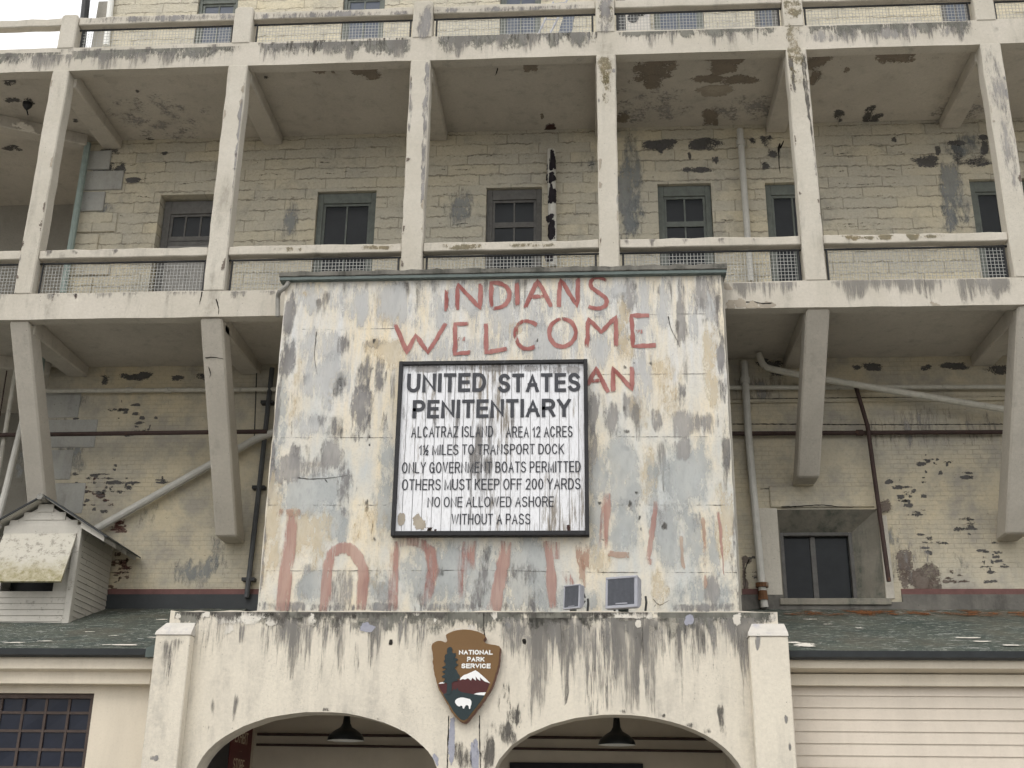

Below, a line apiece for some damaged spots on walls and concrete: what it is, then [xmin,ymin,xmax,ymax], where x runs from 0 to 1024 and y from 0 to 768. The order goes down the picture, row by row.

water stain [0,44,233,70]
water stain [260,0,774,59]
water stain [809,21,967,42]
peeling [642,59,761,173]
peeling [911,134,992,168]
water stain [618,136,643,242]
water stain [267,292,395,514]
peeling [73,464,139,513]
peeling [880,454,951,517]
peeling [889,531,969,589]
peeling [976,541,1009,584]
water stain [175,549,772,768]